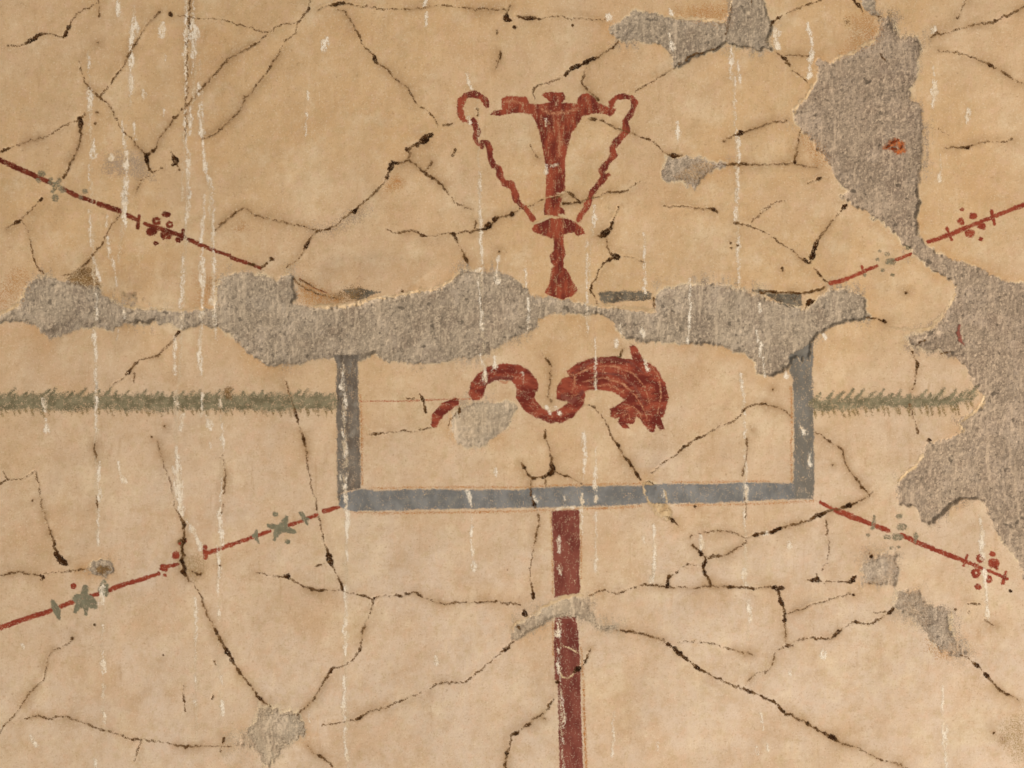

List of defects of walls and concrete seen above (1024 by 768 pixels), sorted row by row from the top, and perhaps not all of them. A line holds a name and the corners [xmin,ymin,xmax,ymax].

damp [66,0,158,546]
damp [172,0,234,739]
crack [151,425,271,707]
crack [0,0,682,304]
crack [256,381,582,725]
flaking render [0,259,872,377]
flaking render [443,390,518,458]
flaking render [506,593,626,643]
flaking render [607,0,782,69]
crack [582,389,902,766]
crack [663,200,848,312]
flaking render [783,0,1024,580]